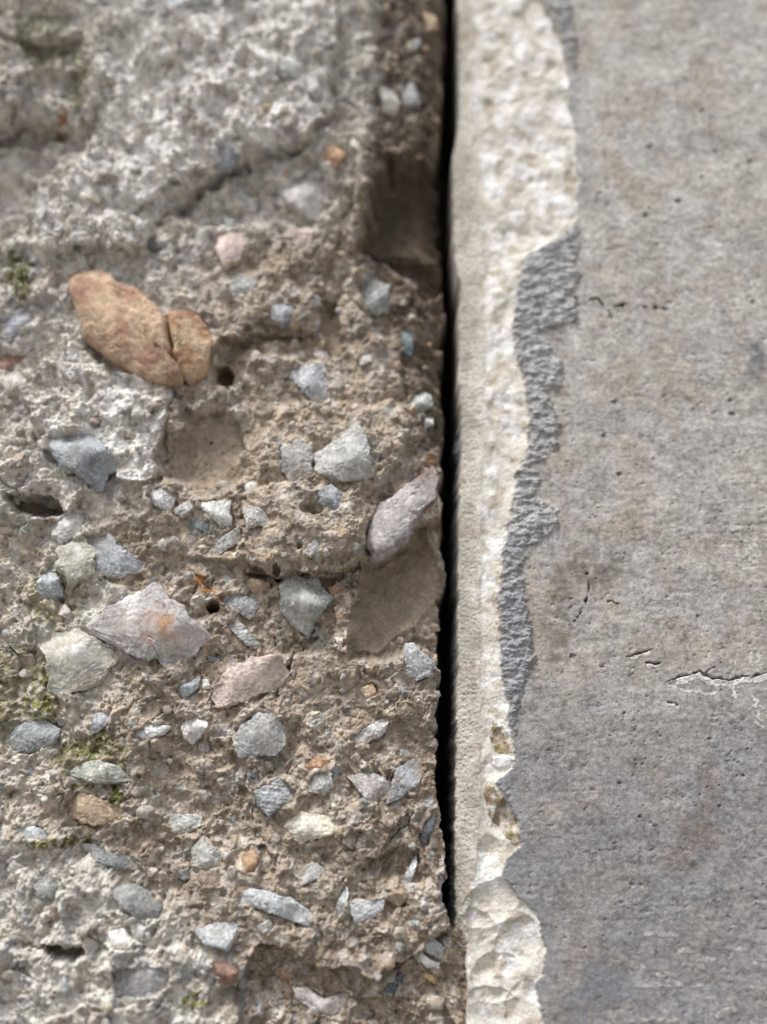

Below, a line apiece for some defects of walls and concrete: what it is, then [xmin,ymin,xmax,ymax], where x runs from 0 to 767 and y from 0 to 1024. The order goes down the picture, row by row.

spalling [466,0,583,1024]
crack [626,650,767,710]